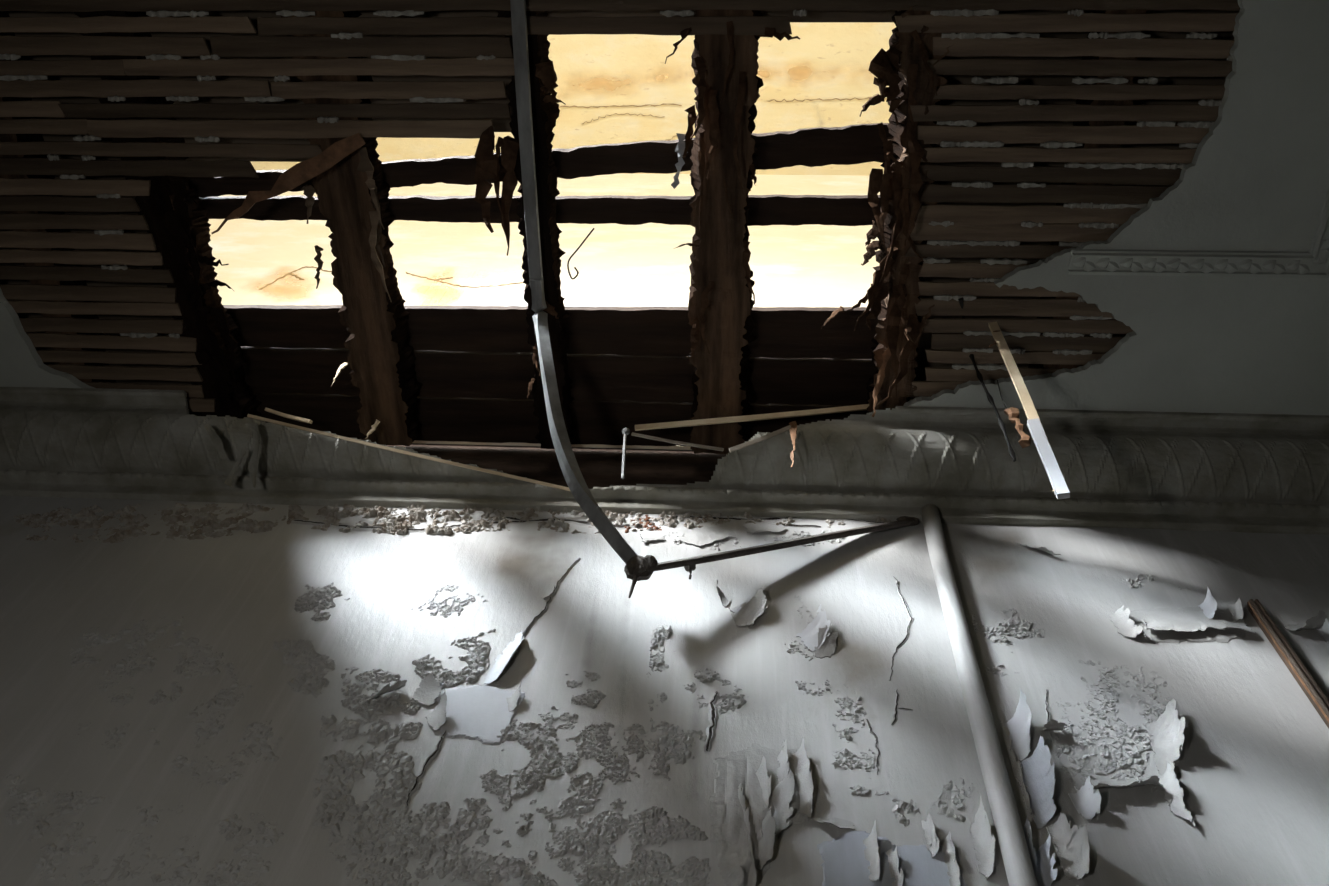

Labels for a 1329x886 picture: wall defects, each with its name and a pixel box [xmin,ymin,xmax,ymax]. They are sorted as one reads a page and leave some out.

spalling [287,503,846,551]
peeling [294,582,350,621]
peeling [411,585,488,618]
crack [287,514,887,635]
peeling [717,580,768,627]
peeling [785,595,838,661]
peeling [1122,573,1155,588]
peeling [1109,586,1256,644]
peeling [682,668,748,715]
crack [866,576,914,775]
peeling [273,625,711,886]
peeling [795,680,996,886]